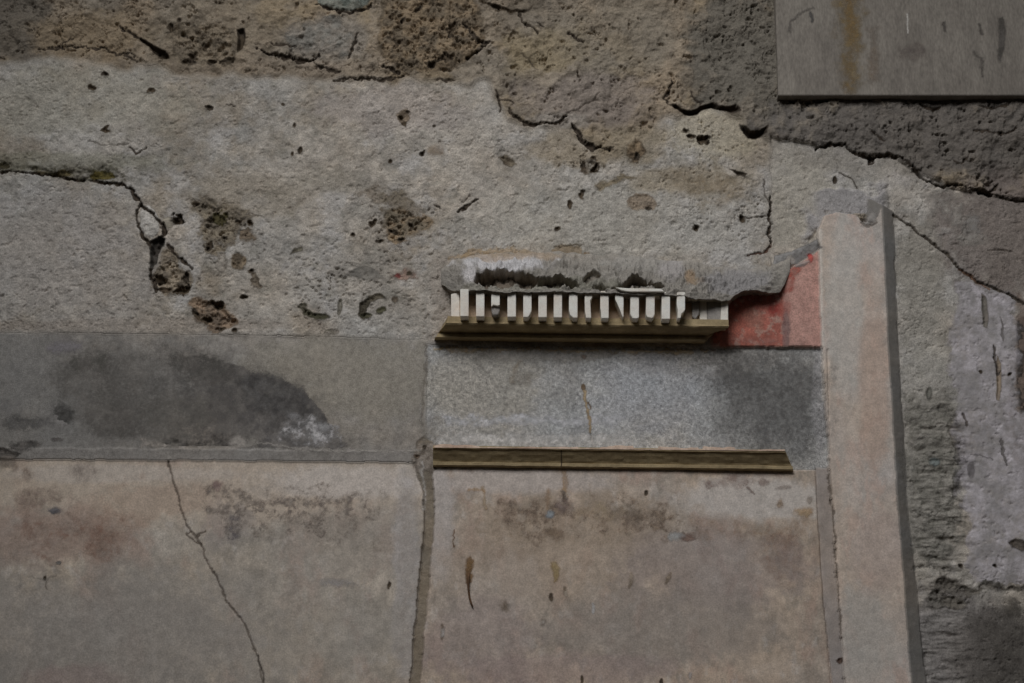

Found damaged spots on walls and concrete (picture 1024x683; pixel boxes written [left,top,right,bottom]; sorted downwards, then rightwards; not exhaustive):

crack [495,90,614,152]
crack [973,102,1017,136]
crack [815,131,1024,203]
crack [0,171,193,293]
spalling [152,248,238,333]
spalling [191,195,262,299]
spalling [357,185,433,244]
spalling [441,239,822,311]
crack [743,179,772,257]
crack [892,215,1024,305]
damp [47,342,426,510]
crack [167,461,264,682]